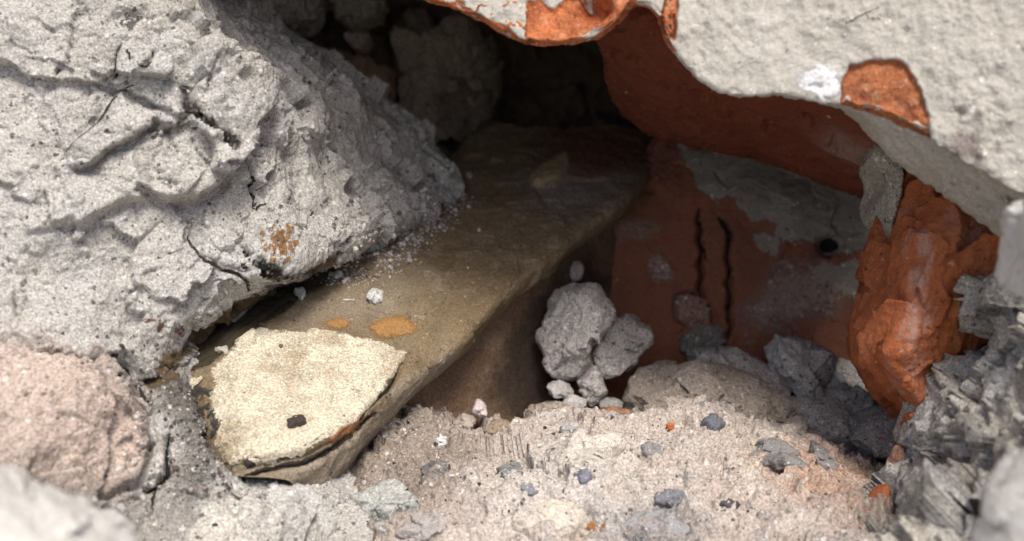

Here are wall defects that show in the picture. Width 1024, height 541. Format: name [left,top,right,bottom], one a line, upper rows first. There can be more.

spalling [425,0,678,54]
crack [66,46,154,151]
spalling [841,60,931,138]
crack [187,236,250,292]
rust [260,223,299,264]
crack [679,208,731,338]